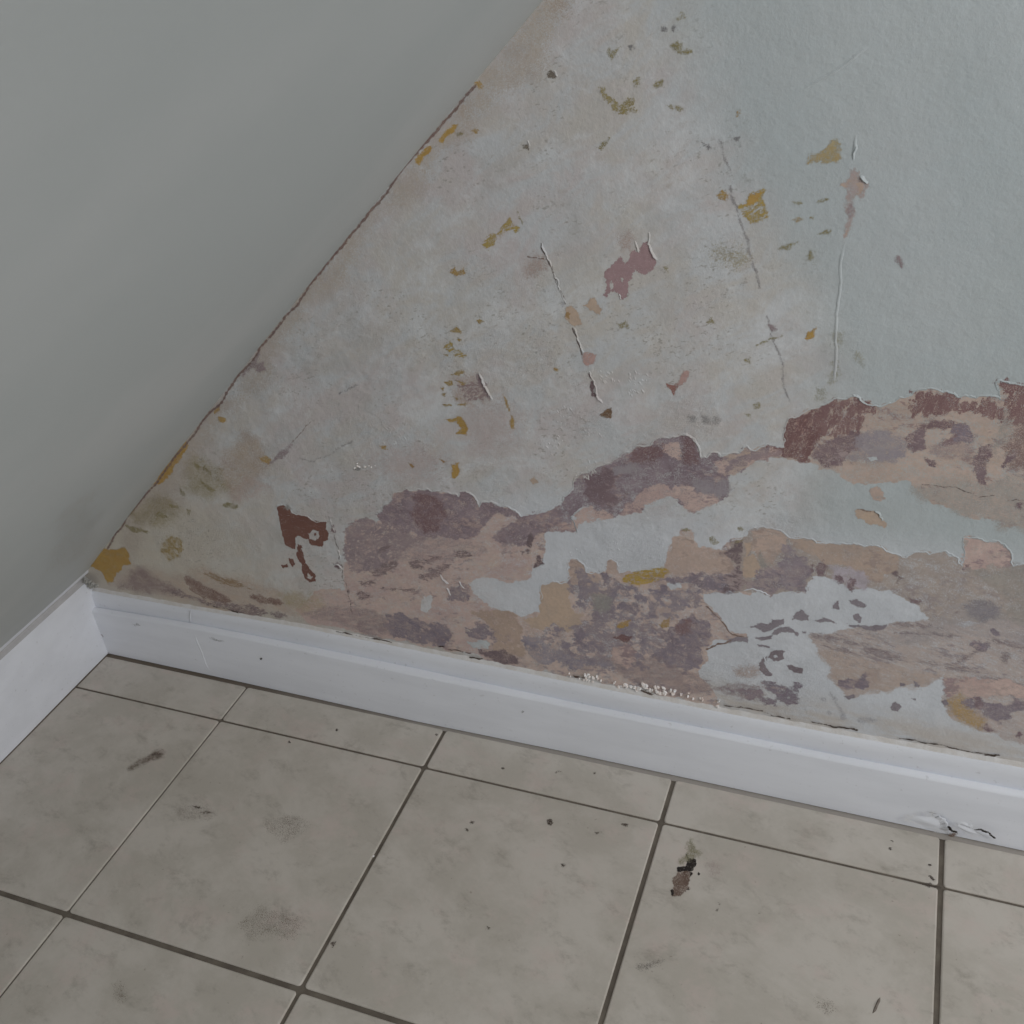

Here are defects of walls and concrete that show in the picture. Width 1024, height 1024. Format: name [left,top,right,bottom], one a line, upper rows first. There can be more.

peeling [840,168,870,238]
peeling [603,231,657,300]
crack [520,243,612,418]
peeling [450,371,493,408]
peeling [666,370,690,396]
peeling [276,377,1024,745]